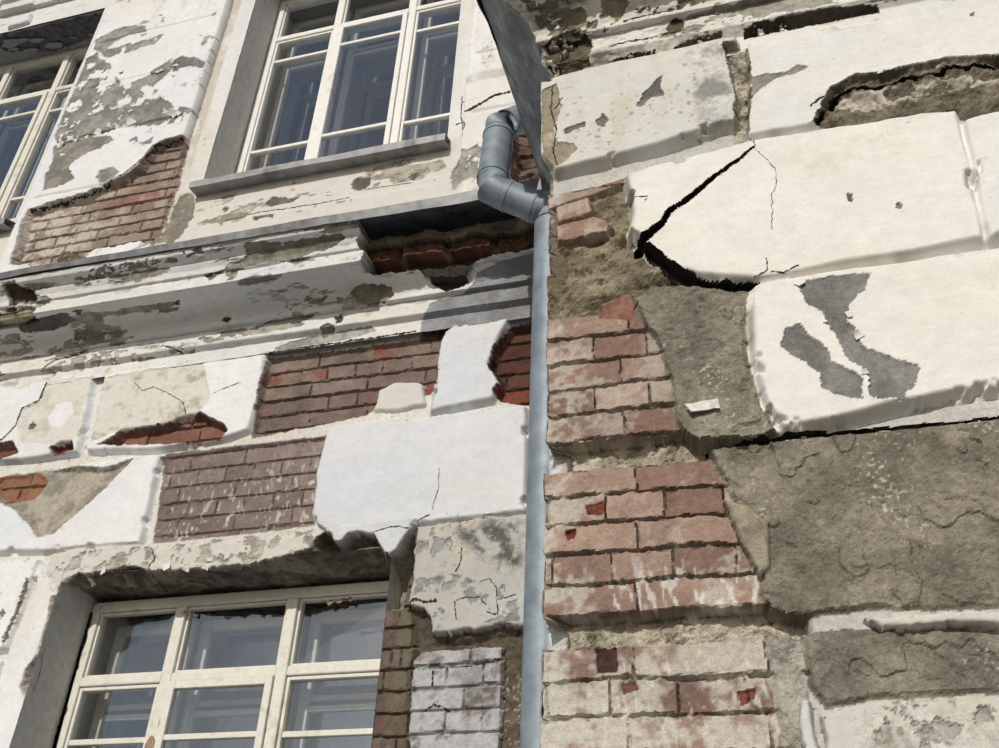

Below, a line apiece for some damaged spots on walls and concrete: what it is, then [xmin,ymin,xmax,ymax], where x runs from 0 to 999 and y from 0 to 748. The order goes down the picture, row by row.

peeling [509,0,899,182]
spalling [812,53,999,130]
crack [633,137,799,292]
spalling [0,14,534,748]
crack [372,468,440,533]
spalling [547,184,999,748]